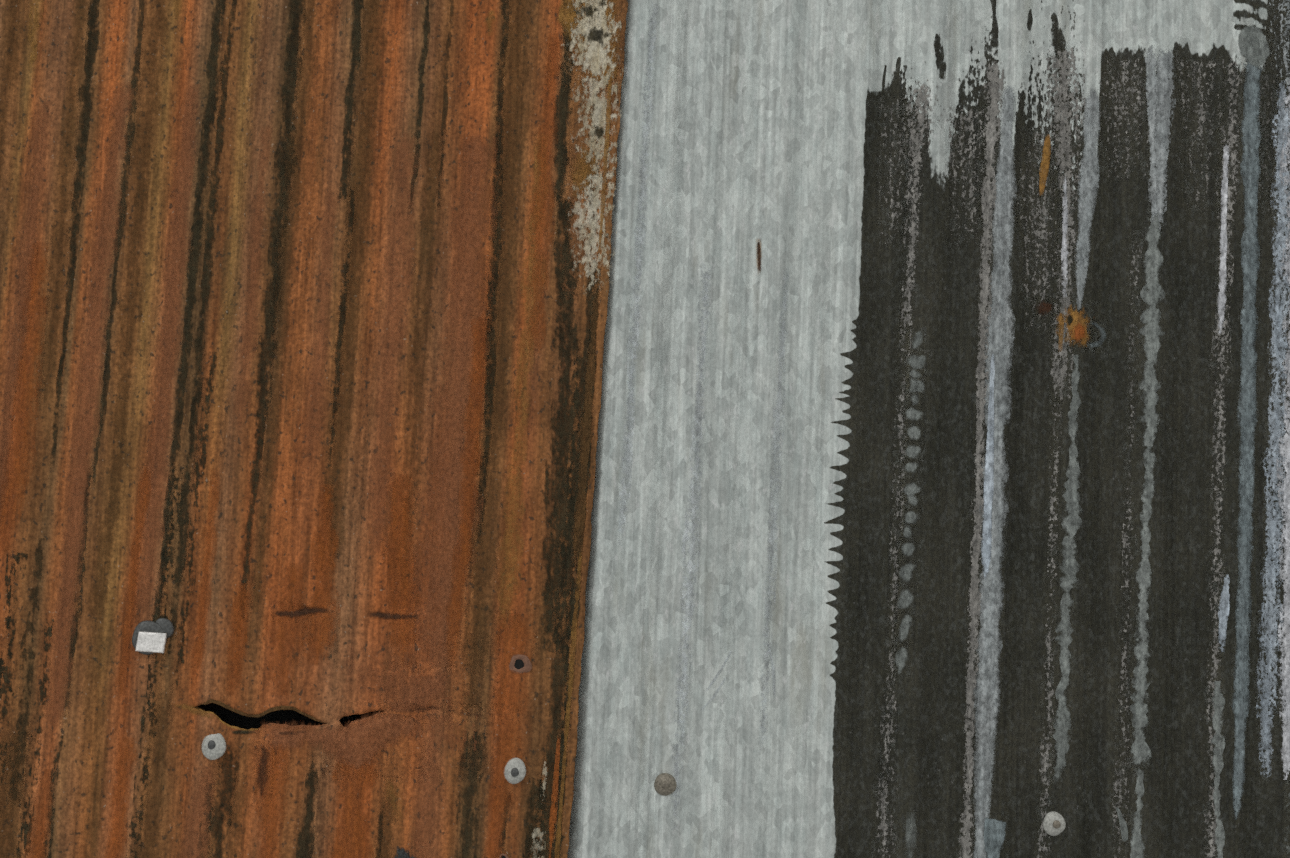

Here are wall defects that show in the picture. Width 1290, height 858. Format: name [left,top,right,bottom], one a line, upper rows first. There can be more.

peeling [570,0,621,290]
corrosion [1039,303,1089,348]
corrosion [549,297,598,858]
crack [182,705,420,793]
peeling [395,847,414,858]